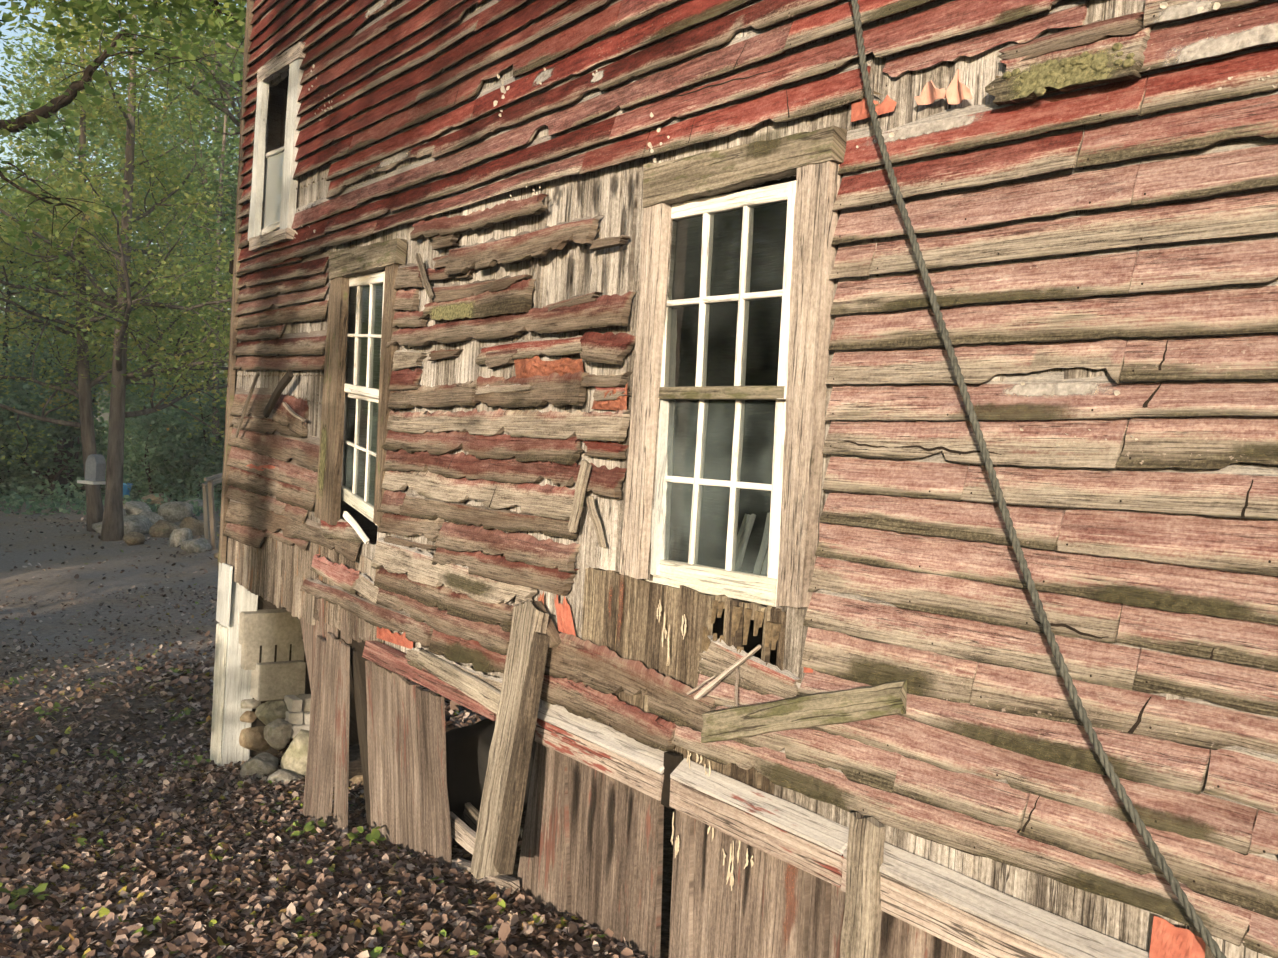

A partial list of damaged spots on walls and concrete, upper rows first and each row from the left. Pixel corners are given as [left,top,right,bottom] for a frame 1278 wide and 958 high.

peeling [365,0,387,18]
peeling [1158,0,1221,22]
peeling [1175,23,1278,63]
peeling [533,68,552,84]
peeling [851,94,897,122]
peeling [874,69,975,142]
peeling [1006,383,1098,396]
crack [1142,340,1168,408]
crack [837,441,1002,455]
crack [1241,479,1253,518]
crack [1100,697,1166,733]
crack [1022,796,1040,832]